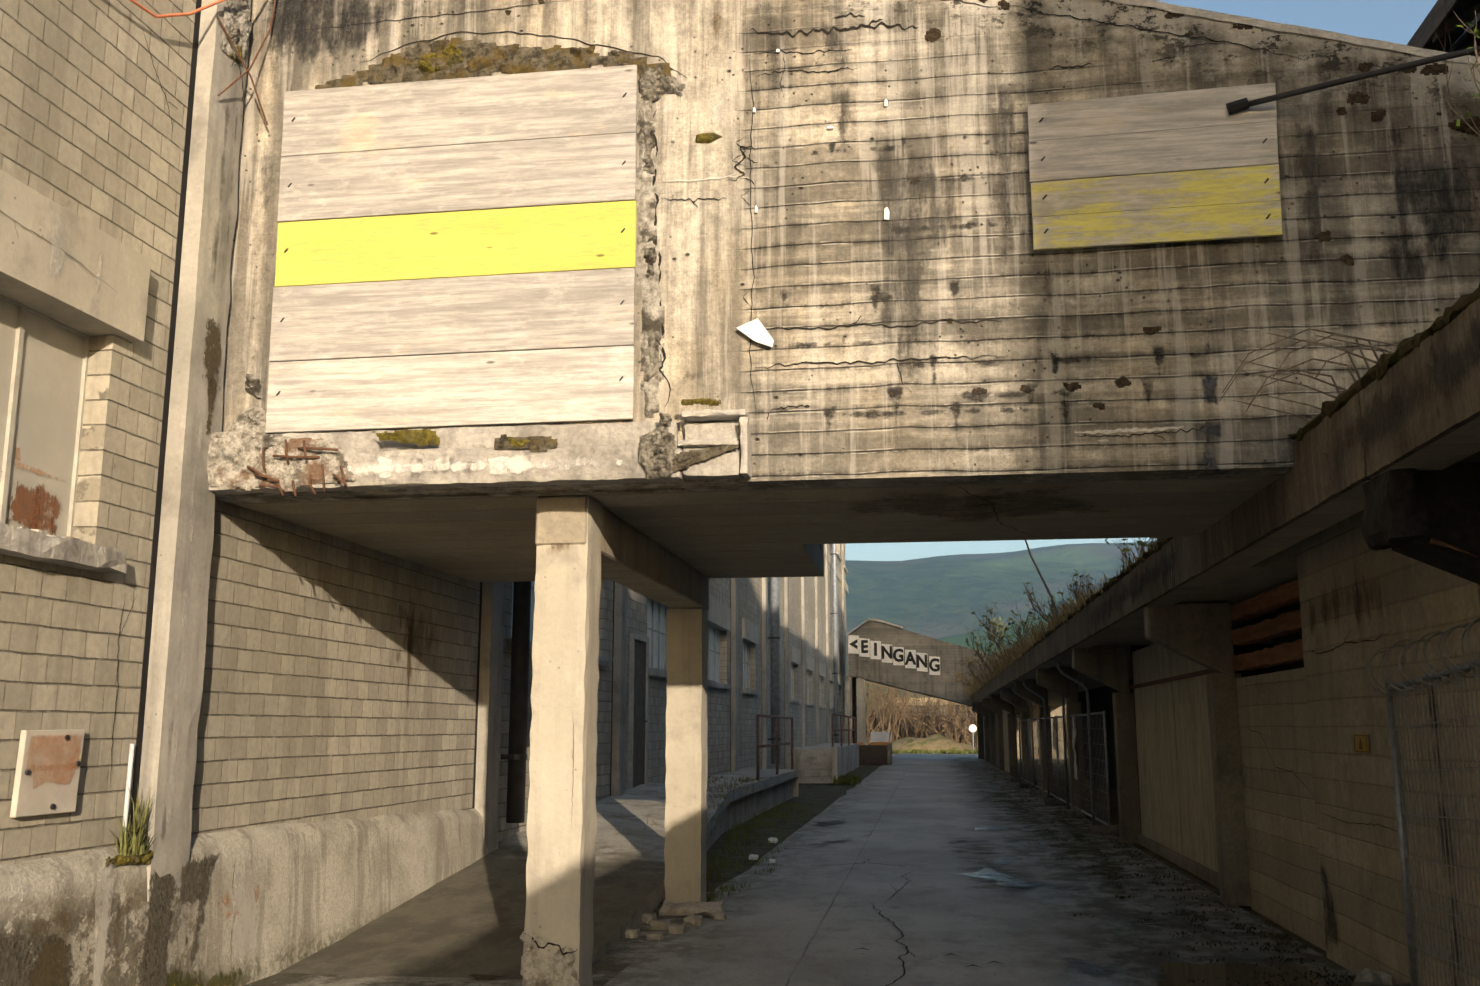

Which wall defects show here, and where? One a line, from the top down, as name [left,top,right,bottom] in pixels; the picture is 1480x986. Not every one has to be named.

spalling [220,0,252,64]
damp [992,89,1014,258]
spalling [315,36,739,479]
damp [871,138,953,412]
rust [7,449,61,535]
damp [206,379,216,435]
spalling [207,374,356,496]
rust [29,736,79,784]
damp [28,936,82,986]
damp [144,853,219,986]
spalling [520,930,580,986]
crack [821,859,915,986]